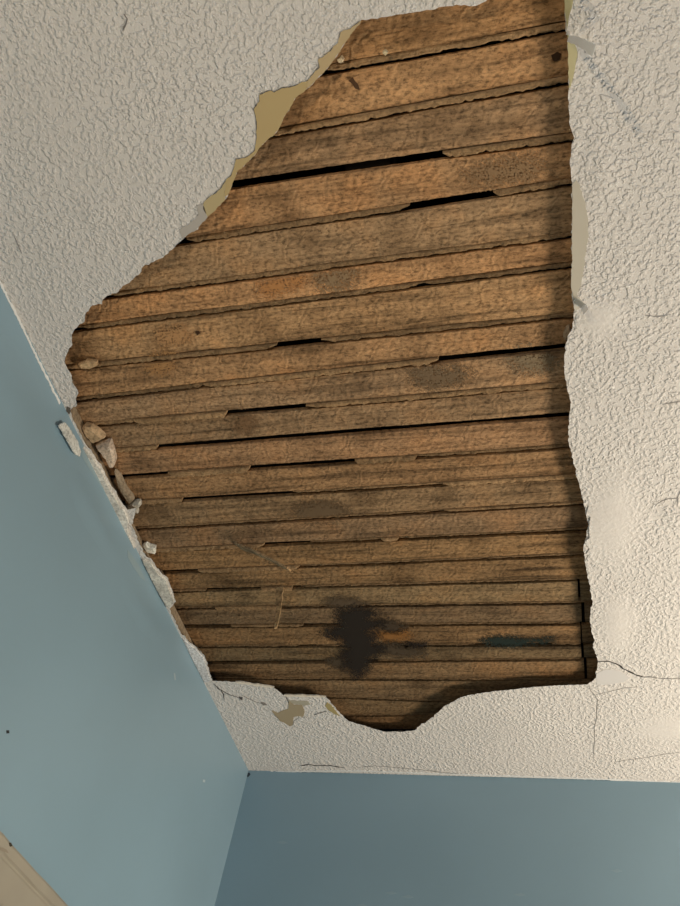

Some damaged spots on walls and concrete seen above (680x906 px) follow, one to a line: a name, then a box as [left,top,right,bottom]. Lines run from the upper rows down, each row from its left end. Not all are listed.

peeling [180,21,361,239]
spalling [571,180,589,315]
spalling [83,446,135,549]
spalling [143,559,174,609]
spalling [183,639,211,683]
damp [317,593,432,683]
damp [478,633,557,651]
peeling [261,694,339,726]
crack [589,661,680,763]